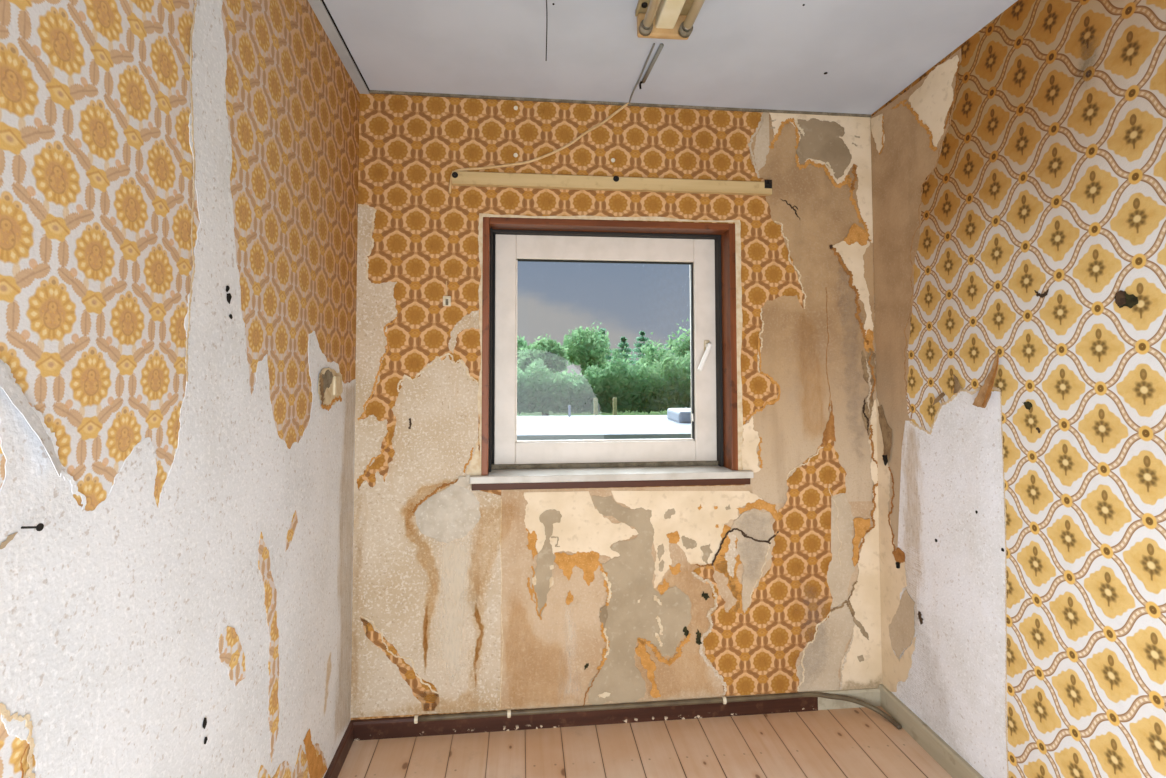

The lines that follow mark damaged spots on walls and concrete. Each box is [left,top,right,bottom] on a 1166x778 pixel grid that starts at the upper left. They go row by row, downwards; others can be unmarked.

peeling [753,112,776,171]
flaking render [796,118,860,180]
peeling [844,223,869,246]
flaking render [463,213,763,476]
peeling [822,401,836,448]
peeling [698,504,774,613]
crack [695,528,779,567]
peeling [827,484,871,609]
peeling [893,548,905,564]
flaking render [526,495,713,706]